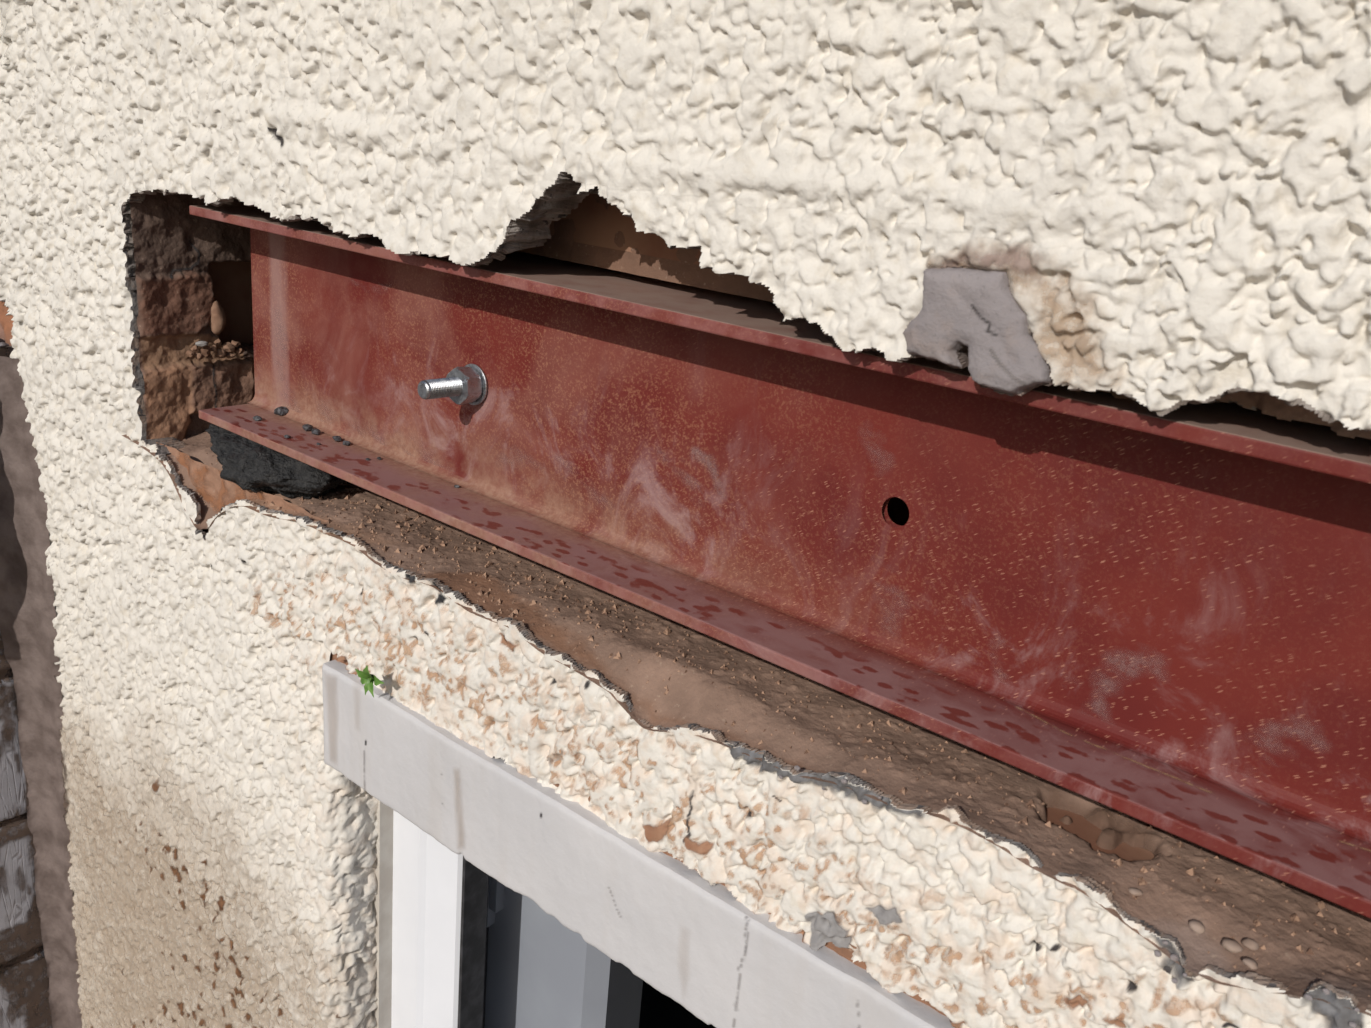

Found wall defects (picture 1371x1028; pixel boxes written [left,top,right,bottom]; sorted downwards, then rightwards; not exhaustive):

flaking render [465,172,701,267]
flaking render [0,299,14,347]
flaking render [121,189,1371,1028]